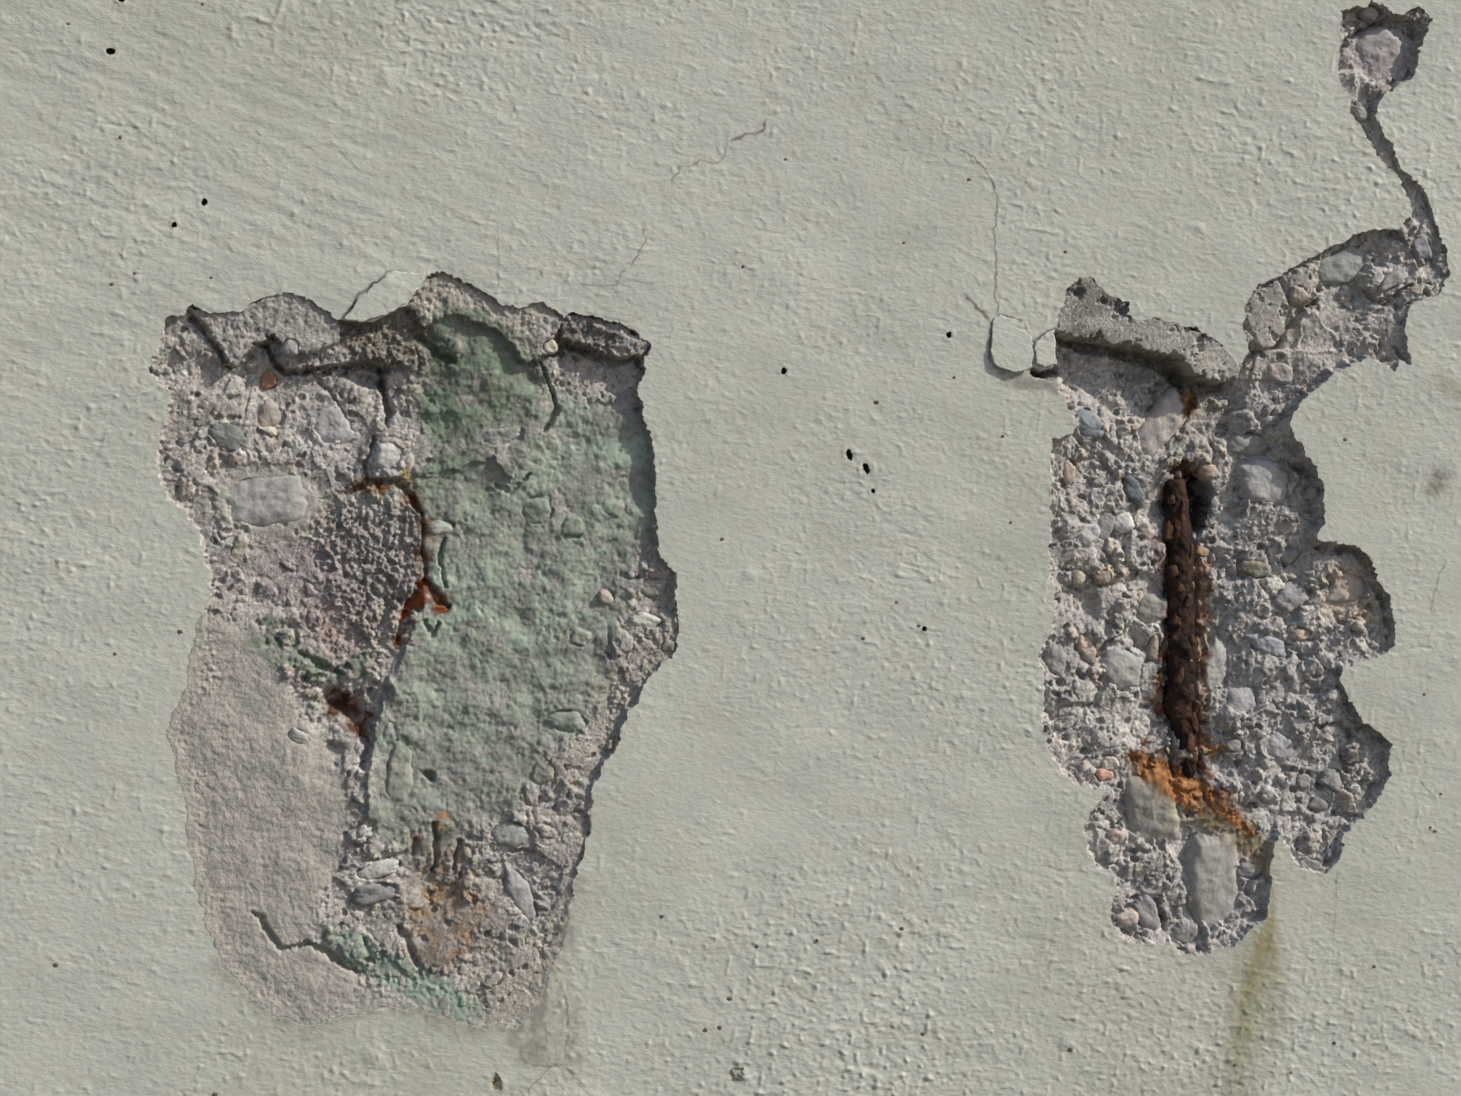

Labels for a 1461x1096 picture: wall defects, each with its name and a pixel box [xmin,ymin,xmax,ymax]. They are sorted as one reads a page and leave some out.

spalling [1338,0,1433,105]
crack [967,258,1053,358]
corrosion [353,468,430,560]
corrosion [1160,461,1197,510]
corrosion [394,578,450,648]
spalling [990,214,1450,957]
spalling [149,270,679,1063]
corrosion [1127,565,1256,838]